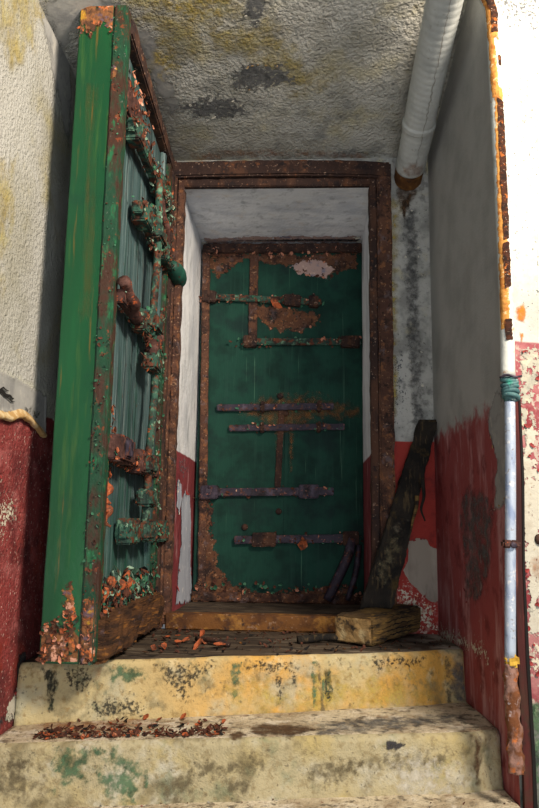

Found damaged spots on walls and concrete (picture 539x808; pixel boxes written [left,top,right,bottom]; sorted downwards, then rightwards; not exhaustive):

rust [248,303,321,334]
peeling [0,498,17,543]
peeling [176,458,361,605]
peeling [519,345,539,677]
peeling [398,537,438,633]
peeling [5,688,17,722]
water stain [42,668,91,712]
water stain [94,691,143,719]
water stain [161,661,213,701]